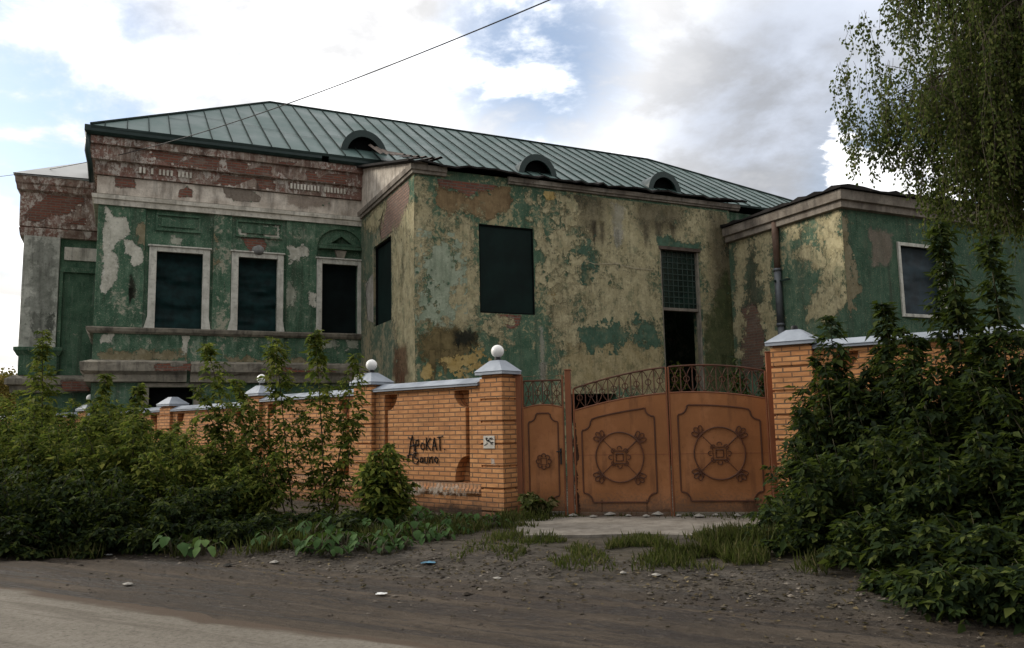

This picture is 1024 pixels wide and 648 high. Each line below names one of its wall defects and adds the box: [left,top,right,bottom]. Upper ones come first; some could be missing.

flaking render [25,194,87,225]
flaking render [115,177,136,189]
flaking render [150,151,298,202]
peeling [100,205,145,295]
peeling [363,176,862,406]
water stain [417,318,482,381]